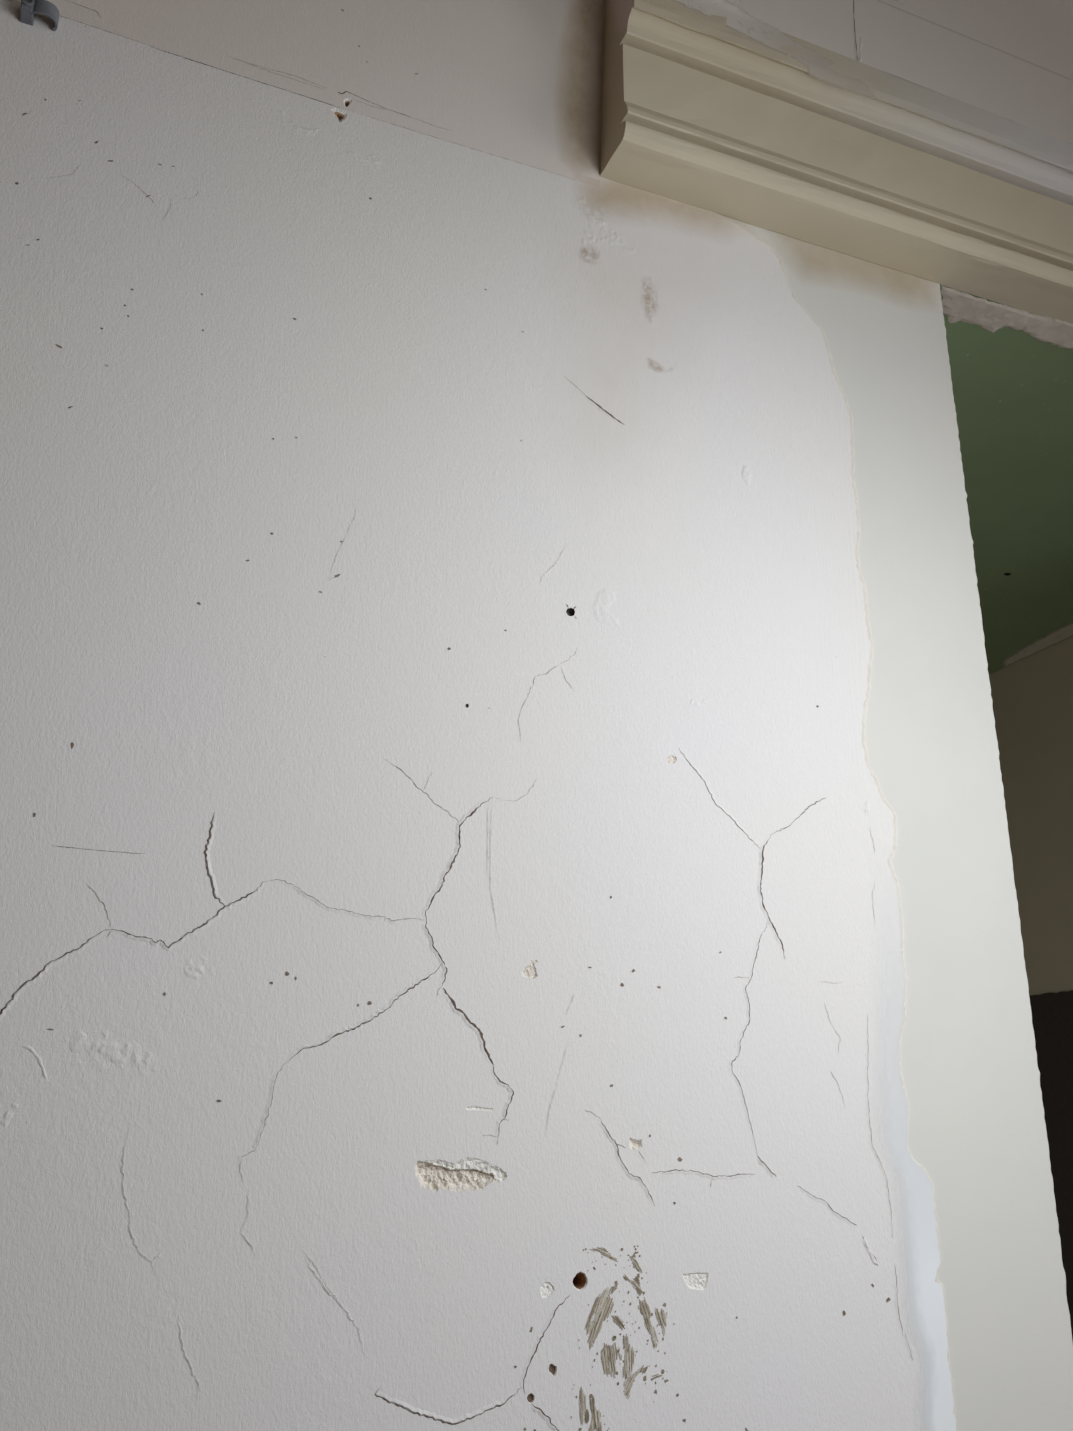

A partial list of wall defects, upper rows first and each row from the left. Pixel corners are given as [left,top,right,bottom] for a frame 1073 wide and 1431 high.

crack [0,759,534,1257]
crack [587,748,913,1361]
crack [120,1130,162,1281]
spalling [415,1157,507,1194]
crack [176,1318,200,1401]
crack [299,1247,570,1431]